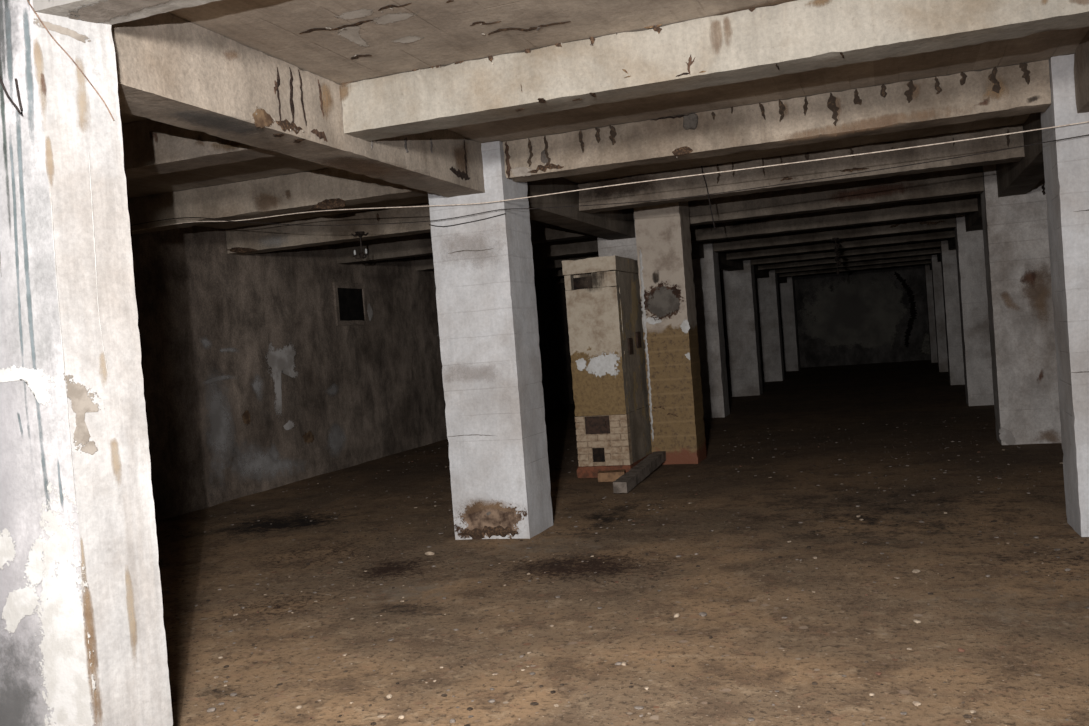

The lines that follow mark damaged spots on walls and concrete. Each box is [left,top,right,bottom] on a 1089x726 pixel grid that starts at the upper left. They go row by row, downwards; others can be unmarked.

leakage [0,0,36,370]
spalling [639,273,690,333]
peeling [576,352,620,377]
leakage [36,400,63,505]
peeling [0,365,101,455]